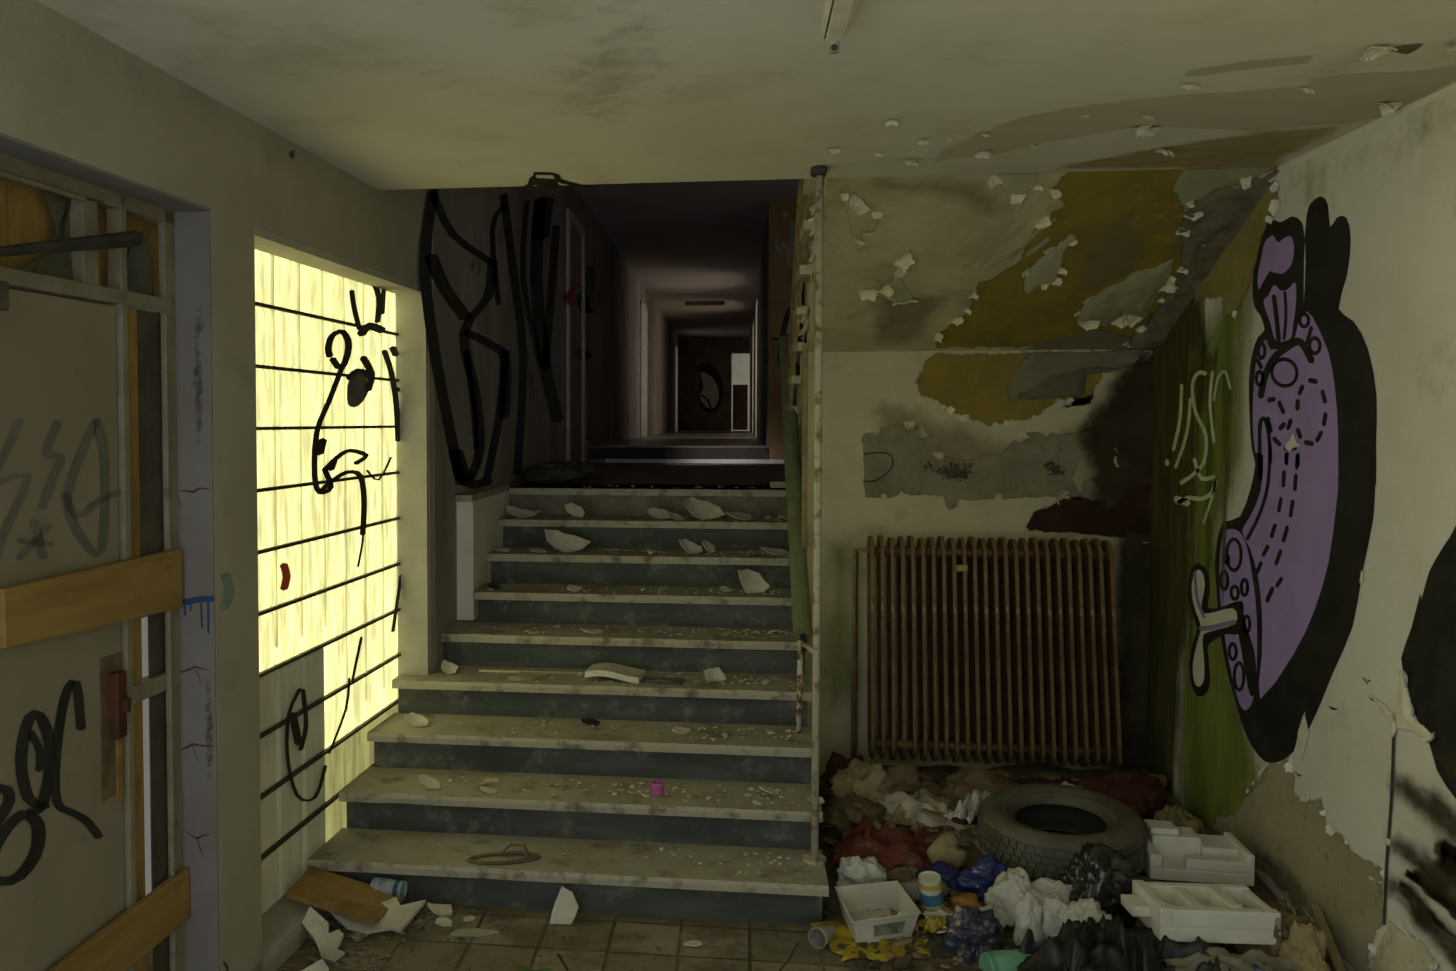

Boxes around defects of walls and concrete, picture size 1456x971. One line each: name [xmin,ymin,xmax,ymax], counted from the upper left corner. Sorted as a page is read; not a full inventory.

peeling [1361,44,1423,61]
peeling [840,193,884,245]
peeling [858,114,1280,543]
peeling [1371,671,1434,744]
flaking render [1210,714,1438,971]